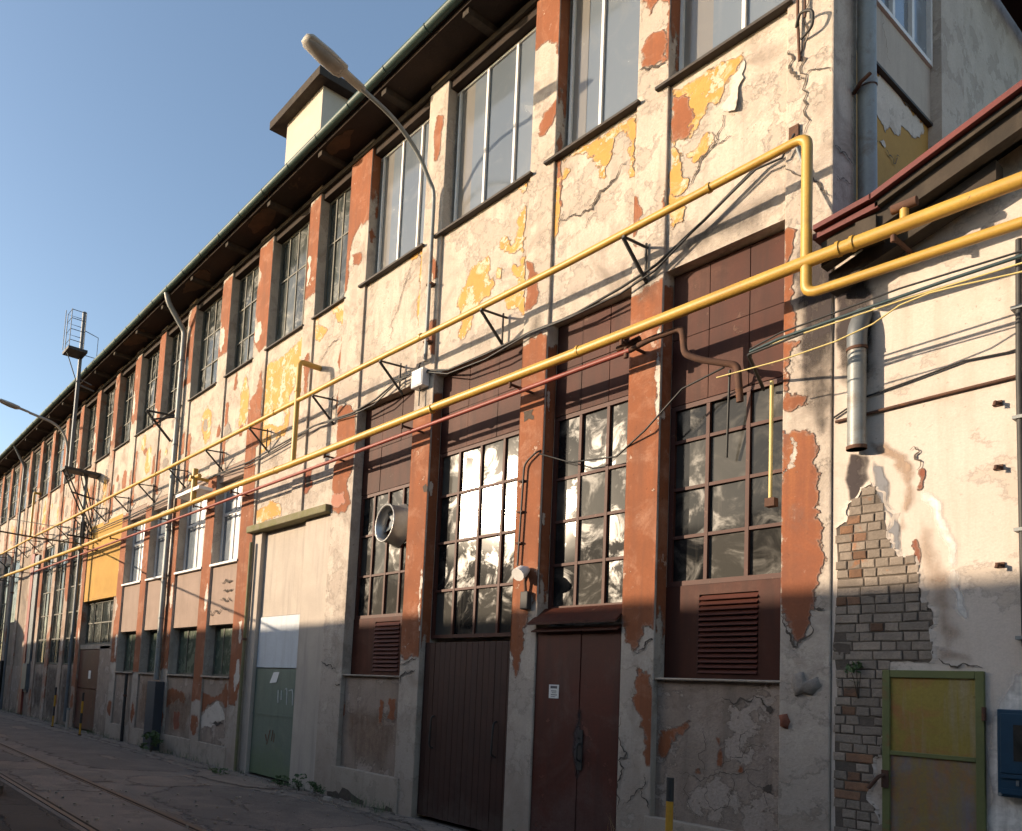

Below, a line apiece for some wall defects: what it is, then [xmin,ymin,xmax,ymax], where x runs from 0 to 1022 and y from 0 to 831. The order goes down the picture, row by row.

peeling [638,0,681,72]
peeling [535,0,637,245]
peeling [254,238,274,352]
peeling [305,194,322,299]
peeling [315,140,381,342]
crack [557,163,625,228]
peeling [0,332,310,736]
peeling [622,278,674,654]
leakage [846,454,900,552]
leakage [876,444,911,510]
leakage [922,492,967,618]
flaking render [781,429,941,831]